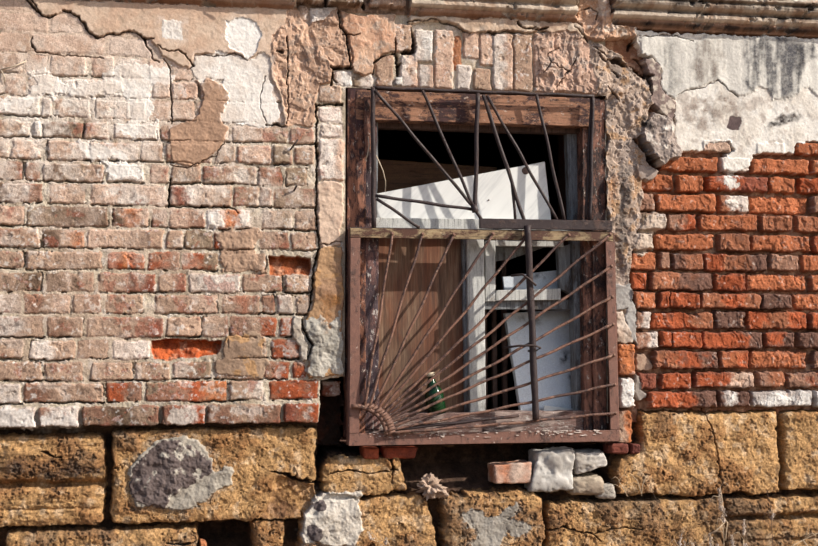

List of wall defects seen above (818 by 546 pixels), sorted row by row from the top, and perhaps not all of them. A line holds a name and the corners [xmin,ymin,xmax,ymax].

crack [26,0,247,124]
crack [260,36,290,128]
crack [543,1,694,102]
water stain [744,37,815,95]
peeling [76,139,144,182]
crack [301,0,549,360]
flaking render [407,0,818,443]
crack [633,138,662,171]
crack [271,459,399,484]
crack [701,408,723,495]
crack [544,525,644,543]